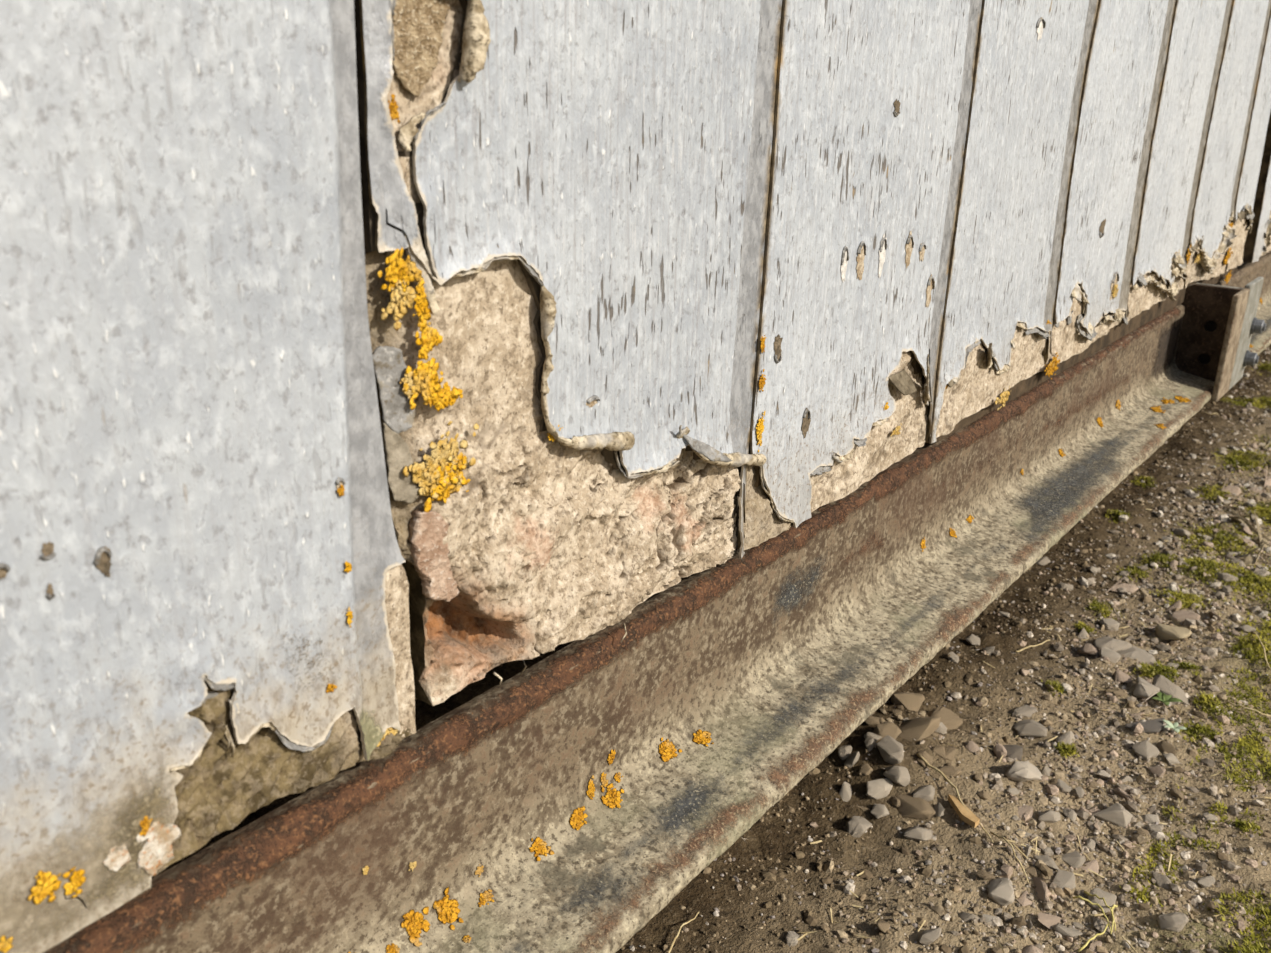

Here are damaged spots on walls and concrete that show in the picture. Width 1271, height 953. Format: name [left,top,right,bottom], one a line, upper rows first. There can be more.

peeling [387,0,491,213]
peeling [102,234,794,877]
corrosion [53,307,1214,953]
peeling [802,408,811,438]
peeling [810,203,1271,512]